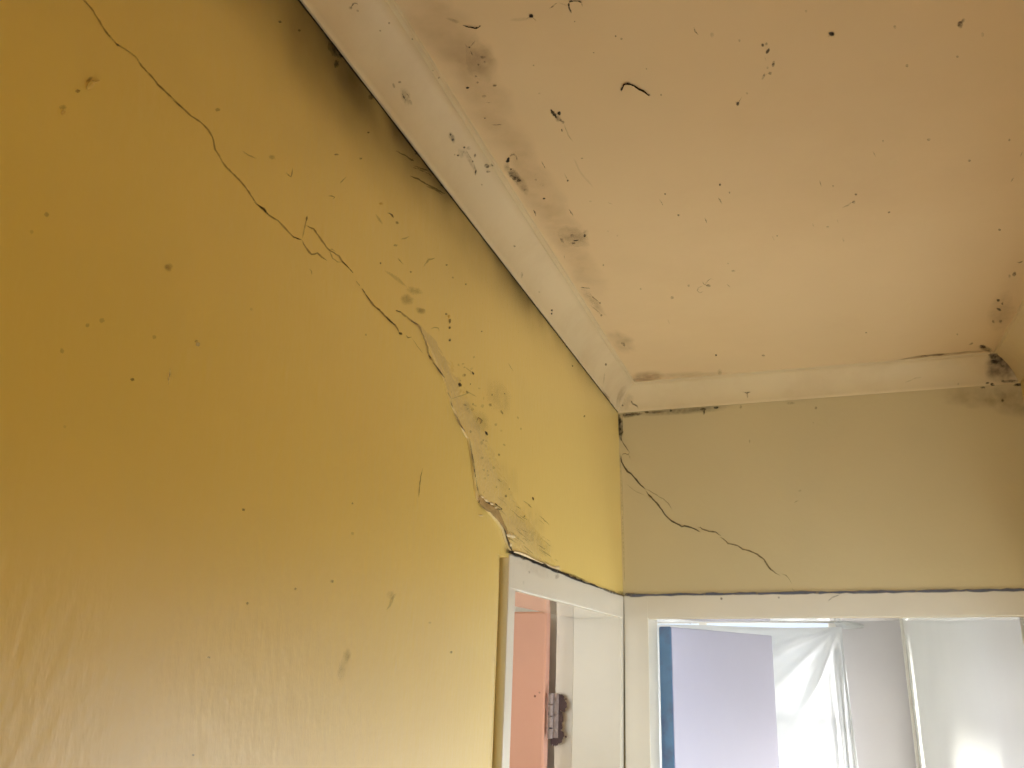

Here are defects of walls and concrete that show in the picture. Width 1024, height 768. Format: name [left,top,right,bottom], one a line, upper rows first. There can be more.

crack [86,2,443,375]
spalling [478,495,560,571]
crack [298,0,1024,597]
water stain [981,345,1021,386]